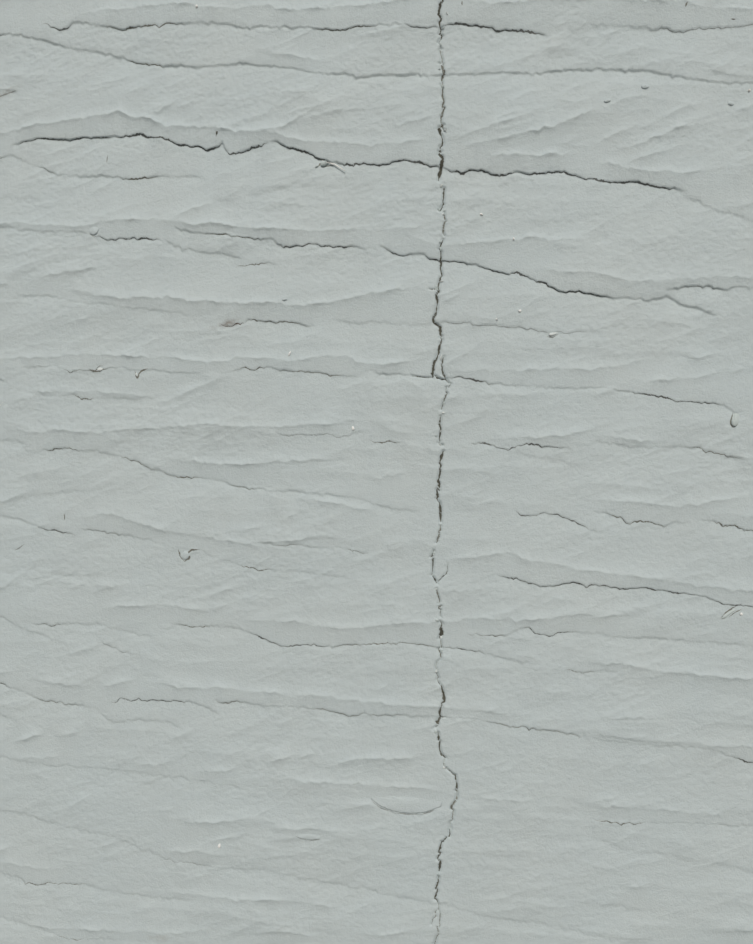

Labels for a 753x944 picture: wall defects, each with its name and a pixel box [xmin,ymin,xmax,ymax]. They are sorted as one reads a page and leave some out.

crack [109,23,185,31]
crack [20,133,220,152]
crack [216,0,673,944]
crack [498,575,752,617]
crack [113,696,187,704]